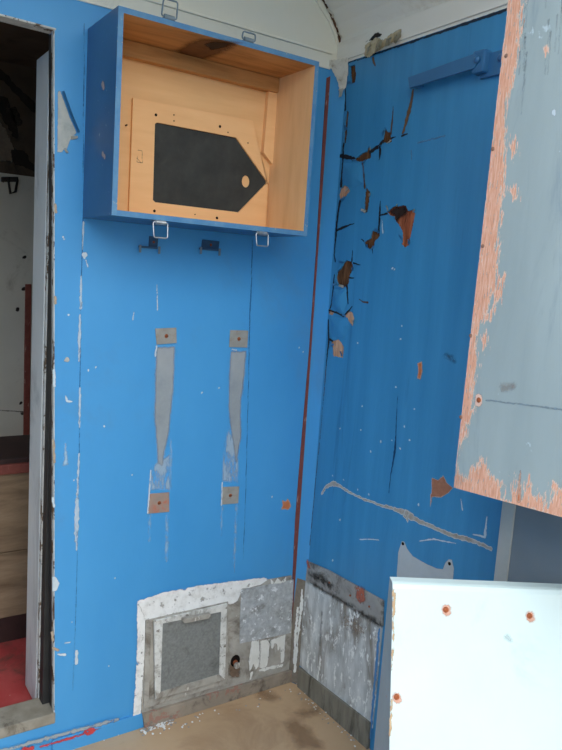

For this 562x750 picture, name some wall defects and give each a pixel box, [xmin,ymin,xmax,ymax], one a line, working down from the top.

crack [310,111,395,537]
crack [389,397,398,488]